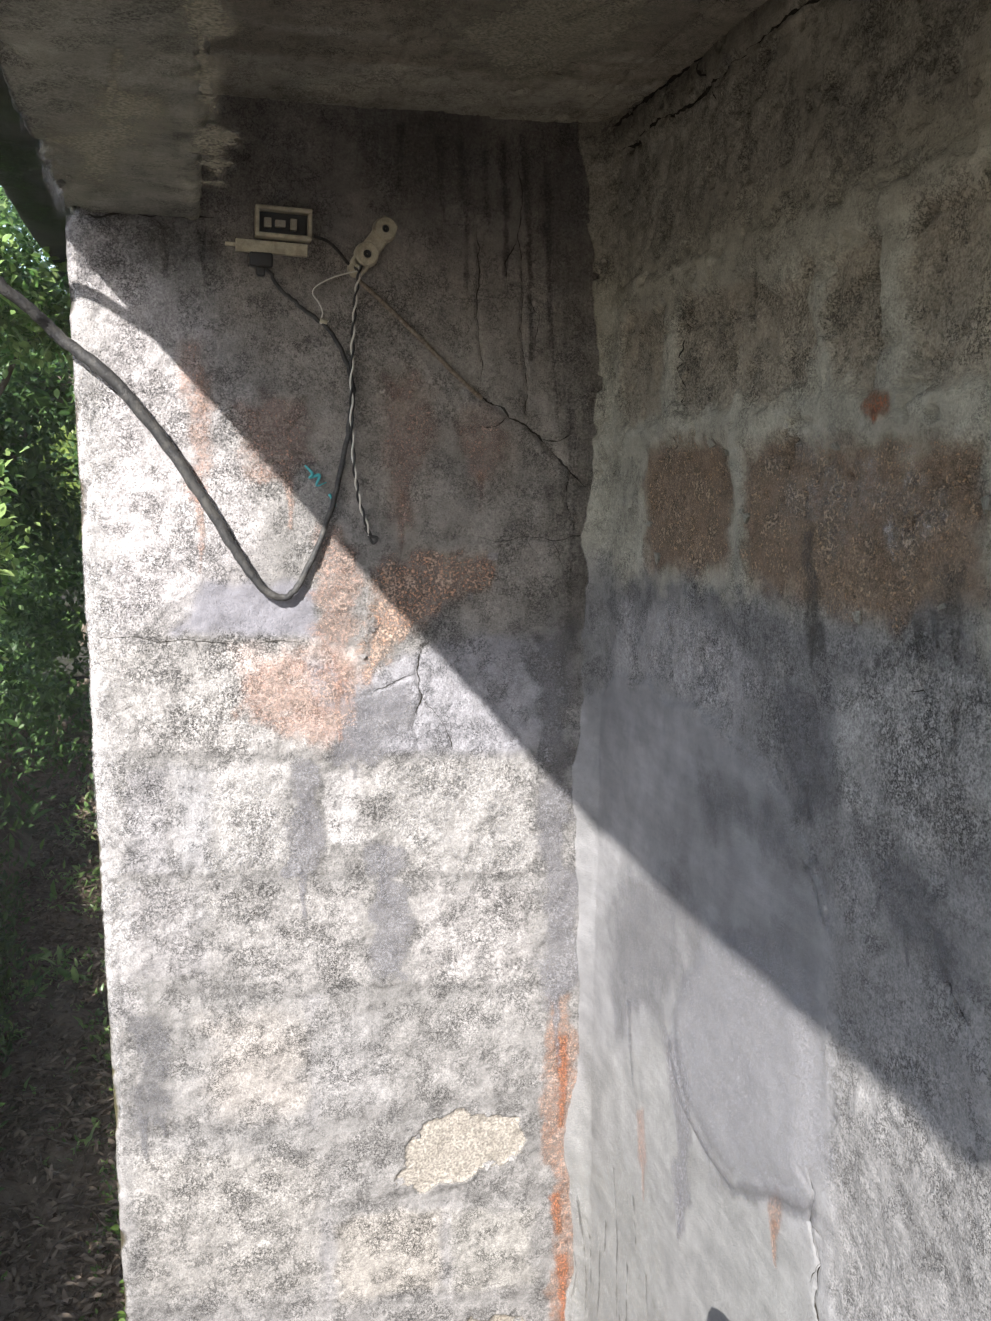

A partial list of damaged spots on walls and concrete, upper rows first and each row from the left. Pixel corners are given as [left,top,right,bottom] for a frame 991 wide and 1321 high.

crack [612,0,851,150]
crack [465,164,587,566]
crack [375,650,453,749]
flaking render [395,1108,526,1193]
corrosion [540,995,577,1321]
leakage [664,1034,690,1237]